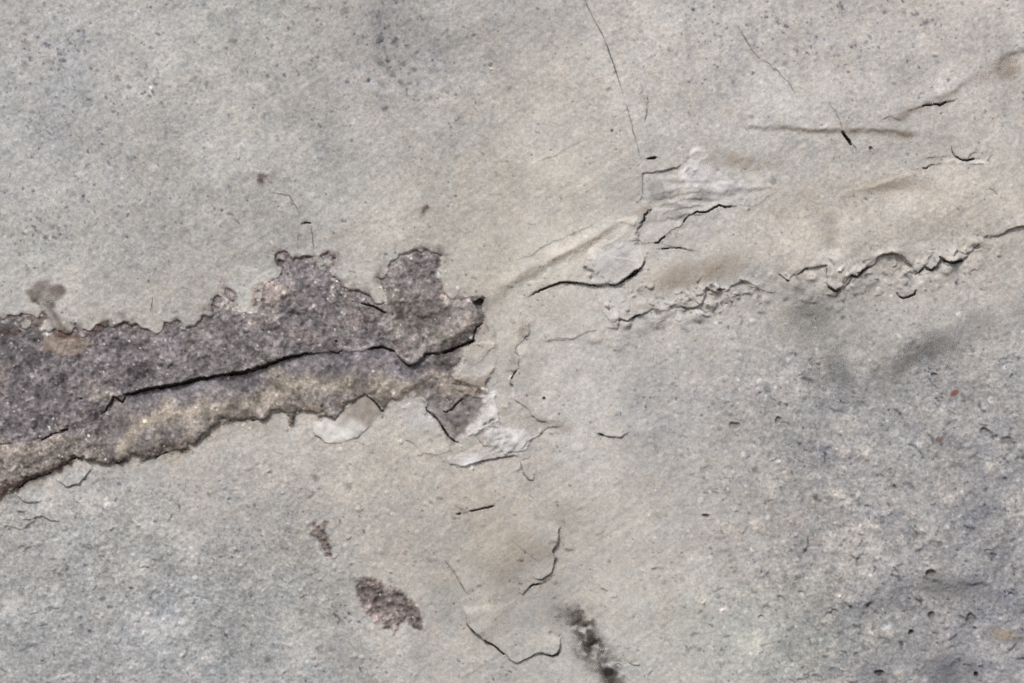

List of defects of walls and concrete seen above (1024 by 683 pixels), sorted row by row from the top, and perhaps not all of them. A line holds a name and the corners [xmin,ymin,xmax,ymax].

crack [633,190,731,251]
crack [538,268,641,293]
crack [899,257,962,299]
crack [103,351,339,413]
spalling [0,249,546,498]
crack [369,325,480,366]
crack [425,399,463,441]
crack [19,444,93,521]
spalling [308,520,333,559]
spalling [356,578,424,634]
leakage [572,610,618,683]